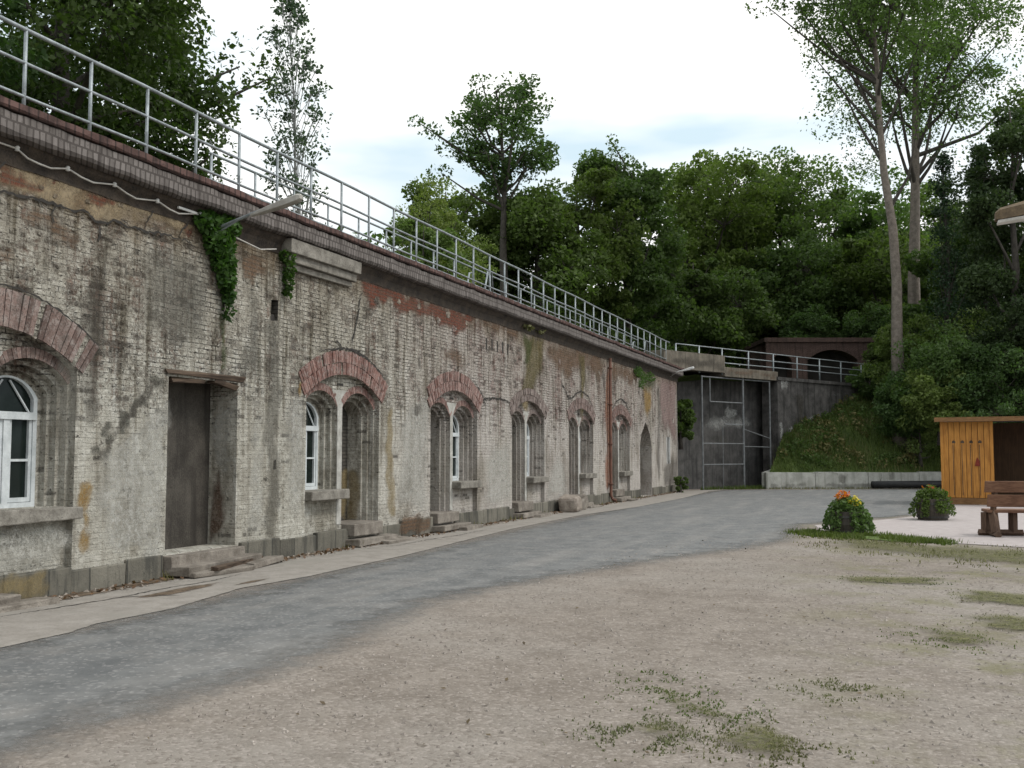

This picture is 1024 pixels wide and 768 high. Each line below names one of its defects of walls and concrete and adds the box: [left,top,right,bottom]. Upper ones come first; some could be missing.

peeling [0,163,193,240]
crack [0,161,196,248]
peeling [362,280,472,333]
corrosion [78,484,91,550]